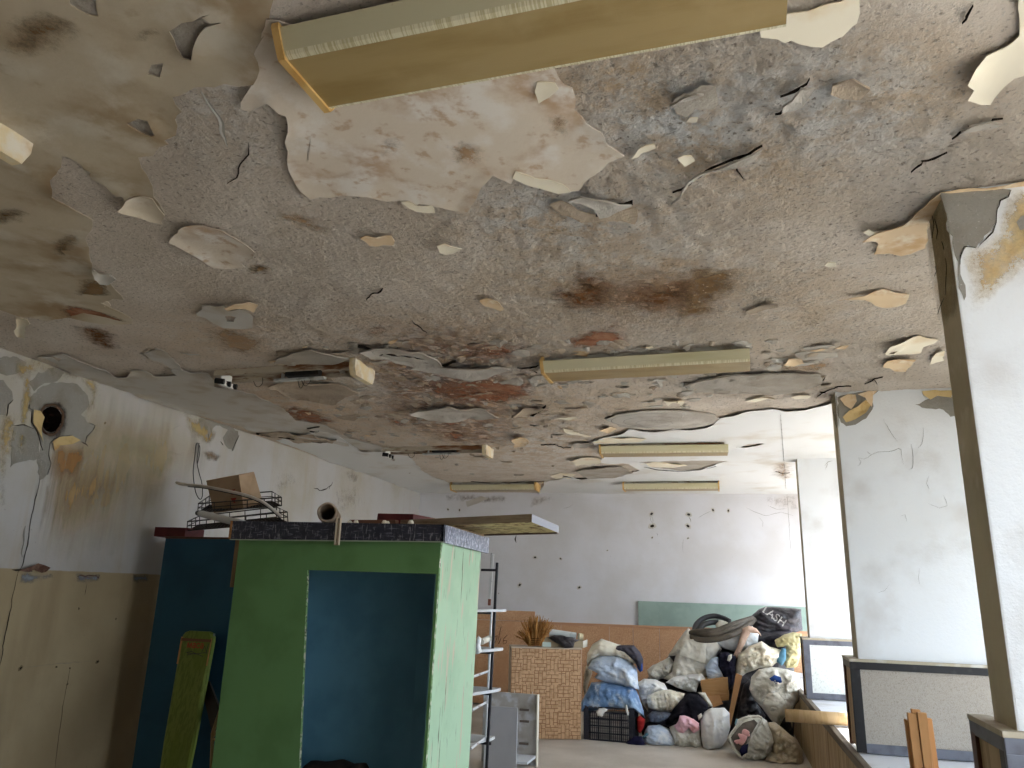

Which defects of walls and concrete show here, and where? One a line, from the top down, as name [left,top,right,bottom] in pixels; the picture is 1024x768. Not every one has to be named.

crack [201,92,249,184]
peeling [0,0,656,339]
crack [673,145,763,193]
crack [775,77,810,116]
peeling [760,0,860,47]
crack [911,118,1003,173]
peeling [968,0,1024,105]
flaking render [862,181,1024,300]
water stain [973,198,1024,289]
corrosion [392,336,527,443]
peeling [511,390,878,494]
crack [0,480,40,664]